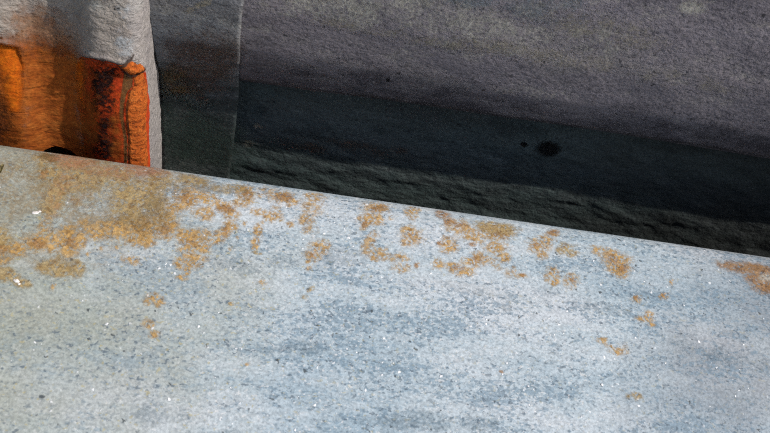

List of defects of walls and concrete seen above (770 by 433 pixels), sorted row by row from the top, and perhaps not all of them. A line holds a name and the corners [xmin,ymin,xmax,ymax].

rust [0,13,320,289]
rust [306,241,330,270]
rust [357,204,421,272]
rust [434,211,524,277]
rust [531,231,577,257]
rust [594,247,630,277]
rust [718,262,770,292]